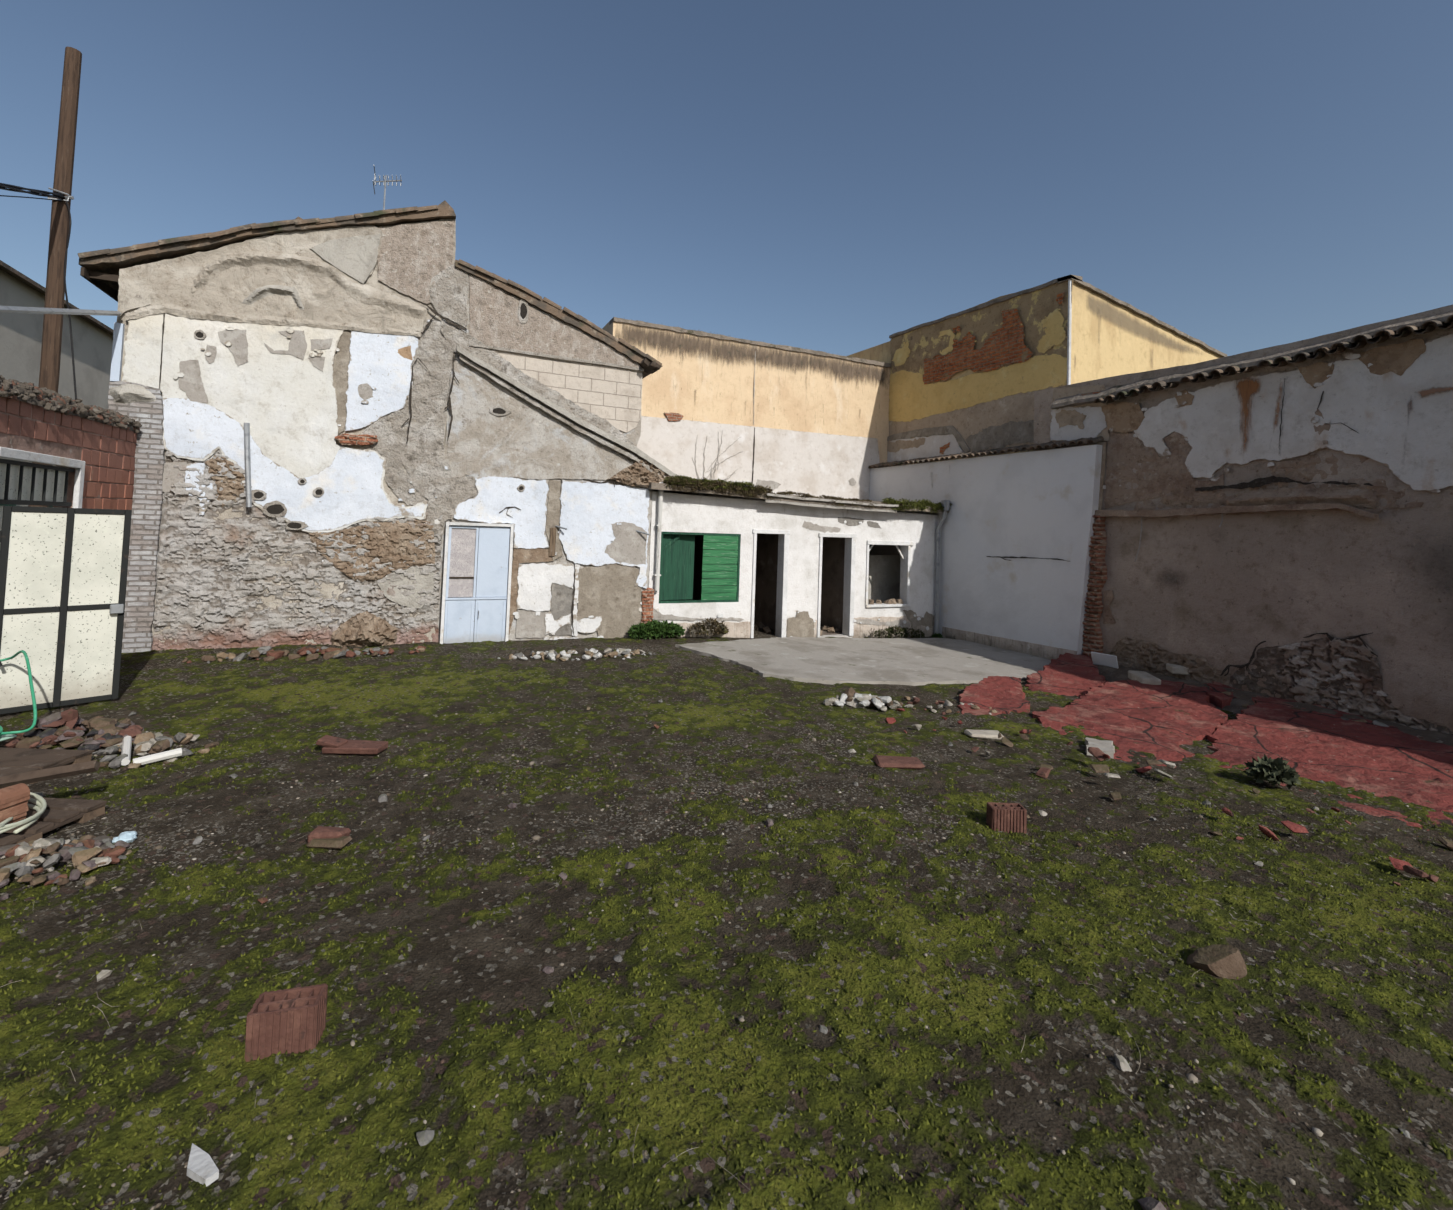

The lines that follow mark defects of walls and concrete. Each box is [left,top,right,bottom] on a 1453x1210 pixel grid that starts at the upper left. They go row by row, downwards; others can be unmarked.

flaking render [151,319,478,650]
flaking render [545,480,563,561]
flaking render [890,279,1073,384]
flaking render [1055,389,1260,518]
rust [1236,379,1260,449]
flaking render [1249,409,1453,519]
flaking render [1295,339,1426,389]
flaking render [513,522,744,638]
flaking render [1107,634,1453,734]